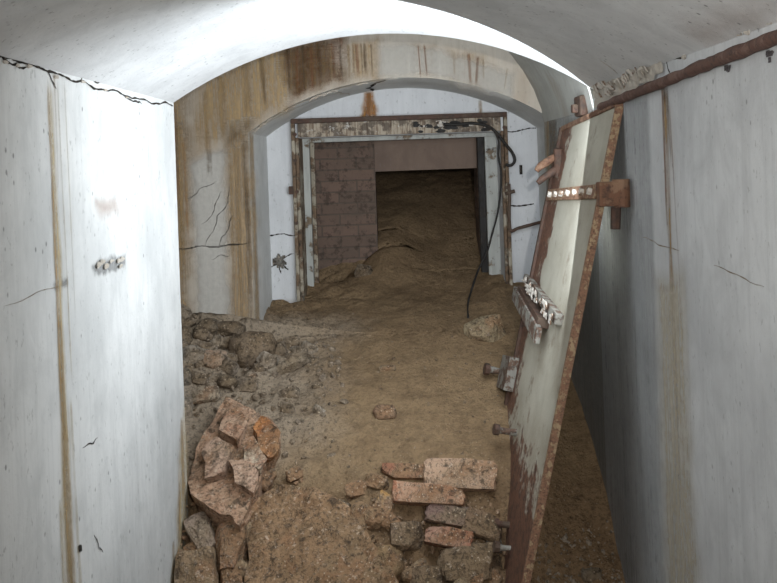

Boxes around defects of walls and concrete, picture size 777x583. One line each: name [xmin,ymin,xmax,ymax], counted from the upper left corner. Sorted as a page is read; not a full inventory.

crack [0,56,173,106]
corrosion [284,37,373,95]
corrosion [362,93,376,117]
crack [179,186,251,260]
peeling [94,256,126,274]
leakage [53,176,73,583]